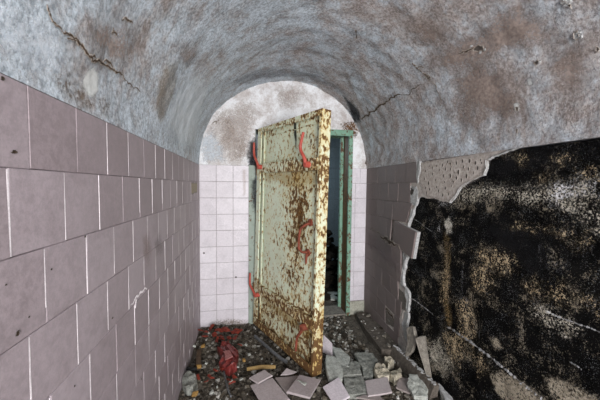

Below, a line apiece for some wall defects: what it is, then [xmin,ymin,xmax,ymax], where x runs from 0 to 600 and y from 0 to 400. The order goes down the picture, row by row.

crack [46,5,140,92]
water stain [345,98,360,122]
crack [359,63,442,120]
water stain [247,141,258,167]
spalling [398,139,600,400]